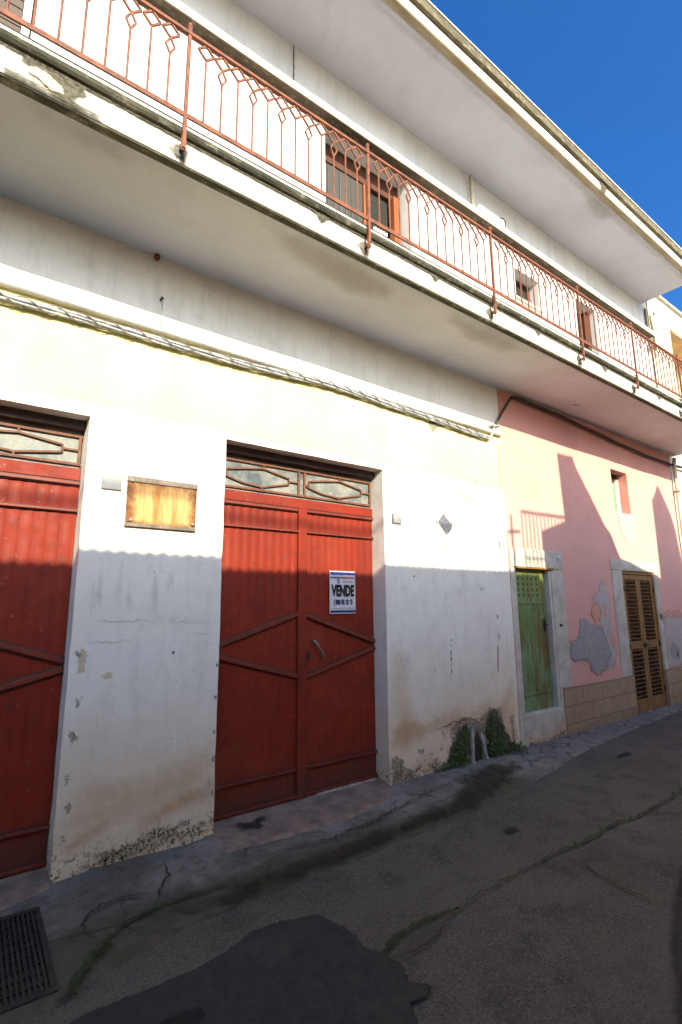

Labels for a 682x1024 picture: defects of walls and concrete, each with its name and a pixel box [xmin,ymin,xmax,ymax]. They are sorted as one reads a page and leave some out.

damp [0,40,682,408]
flaking render [569,580,617,676]
damp [395,707,516,780]
damp [81,820,205,870]